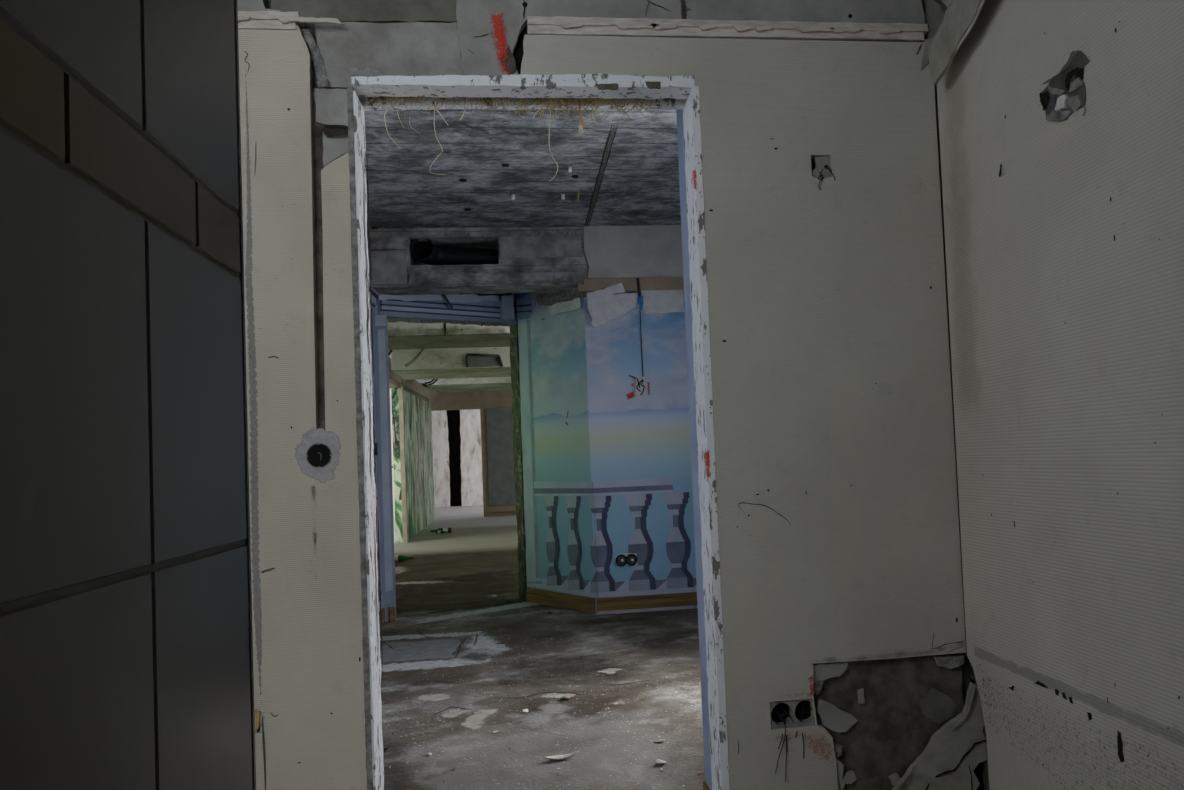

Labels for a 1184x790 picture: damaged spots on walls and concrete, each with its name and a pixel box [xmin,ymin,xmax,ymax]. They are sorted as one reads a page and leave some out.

peeling [921,0,987,85]
hole [1039,50,1090,122]
spalling [813,653,987,790]